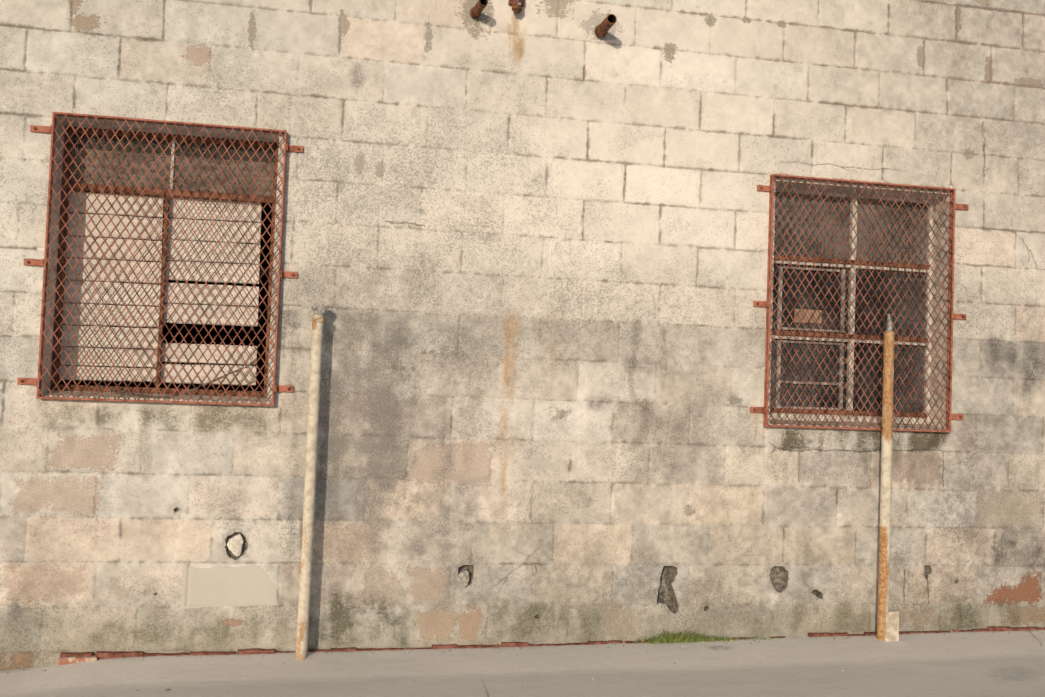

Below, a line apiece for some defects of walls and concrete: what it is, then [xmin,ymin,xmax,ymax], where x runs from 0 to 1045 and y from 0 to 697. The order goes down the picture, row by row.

damp [782,430,802,451]
damp [858,430,882,452]
damp [910,431,947,452]
spalling [225,532,248,560]
spalling [457,564,474,588]
spalling [646,566,679,613]
spalling [769,566,789,592]
peeling [981,572,1043,614]